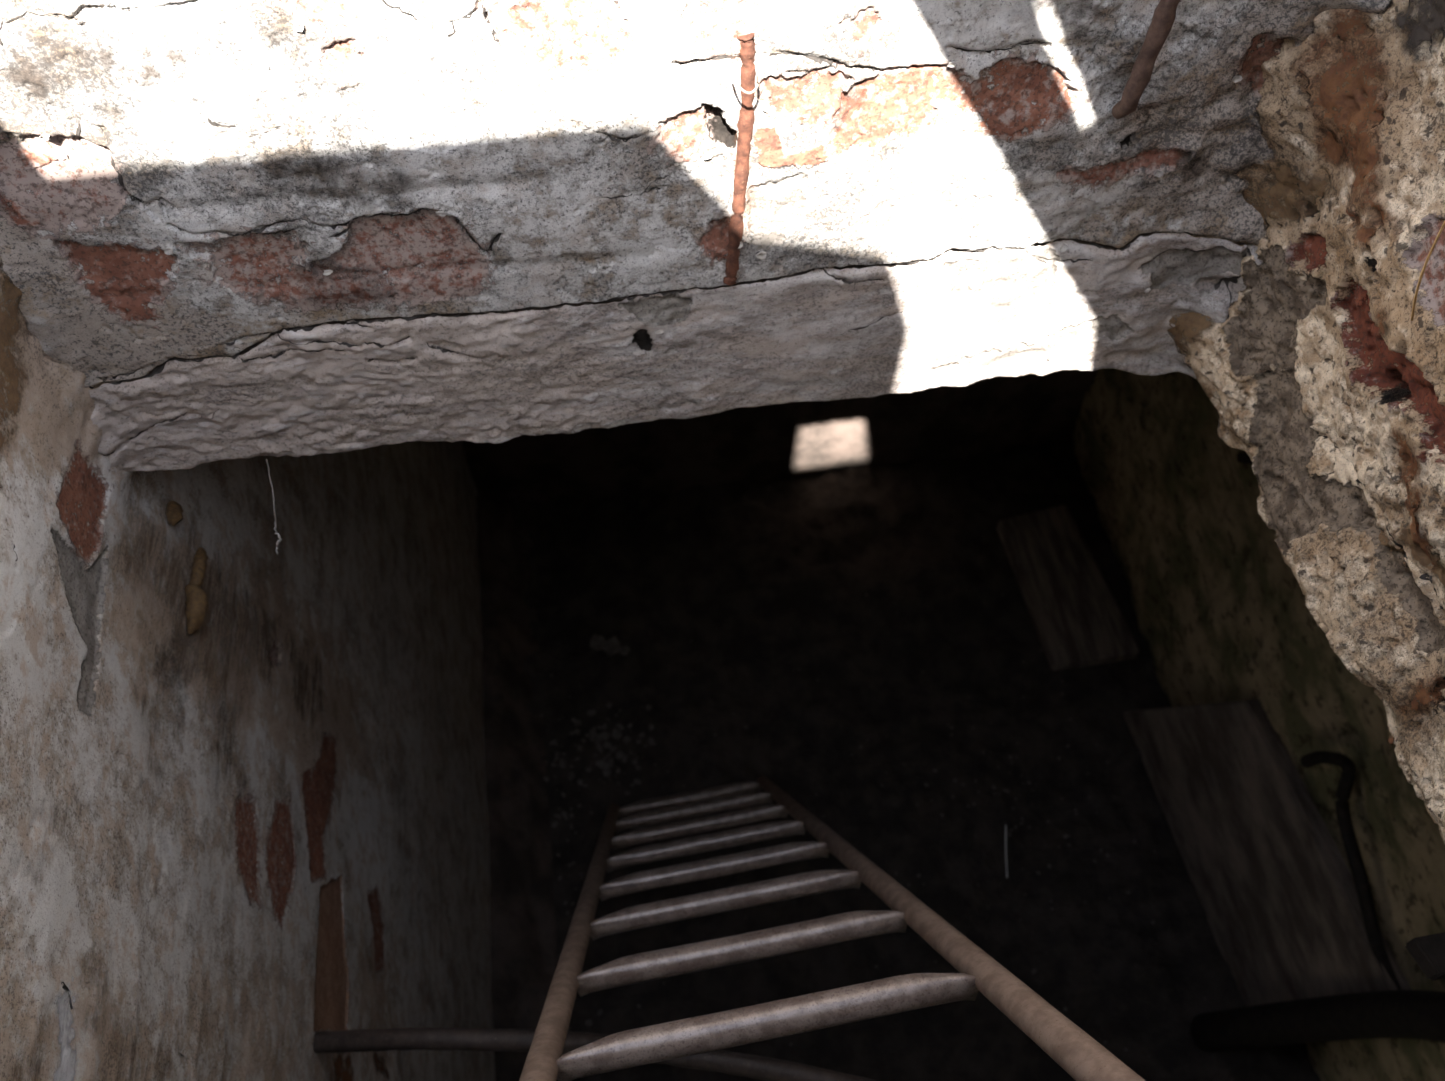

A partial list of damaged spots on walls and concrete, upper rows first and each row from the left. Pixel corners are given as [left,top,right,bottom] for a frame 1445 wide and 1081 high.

spalling [0,127,497,329]
spalling [274,0,380,89]
spalling [460,0,774,83]
crack [89,232,1257,389]
corrosion [723,32,760,286]
spalling [694,0,1092,267]
corrosion [1112,0,1180,119]
spalling [1232,32,1300,107]
spalling [1402,213,1445,328]
peeling [1138,232,1445,657]
peeling [50,438,118,716]
peeling [232,732,350,1032]